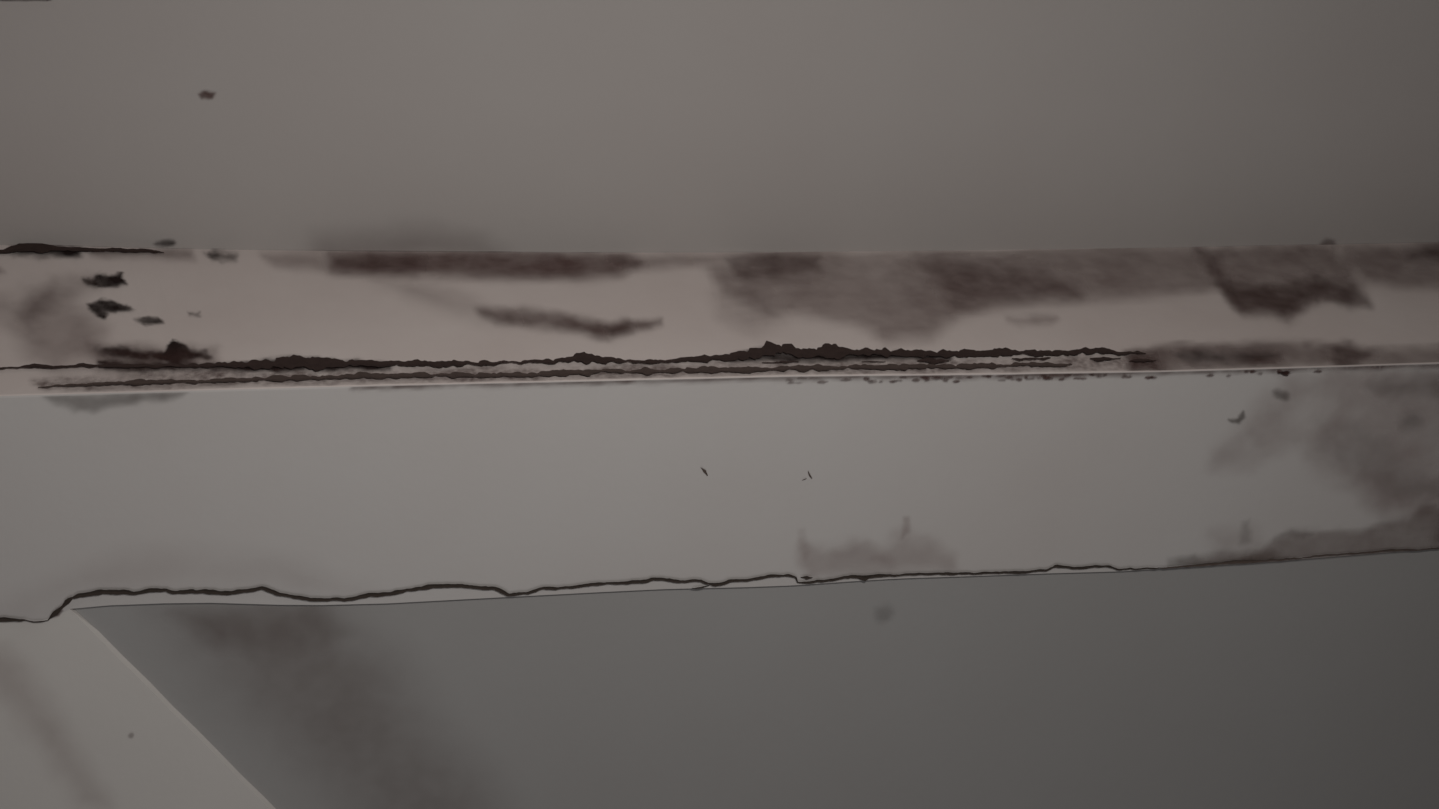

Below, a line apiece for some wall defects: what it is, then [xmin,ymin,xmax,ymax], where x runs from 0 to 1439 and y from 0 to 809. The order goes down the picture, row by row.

mould [83,272,162,323]
damp [556,319,647,335]
mould [98,341,210,370]
damp [1005,359,1113,377]
damp [1234,348,1294,370]
crack [0,547,1439,623]